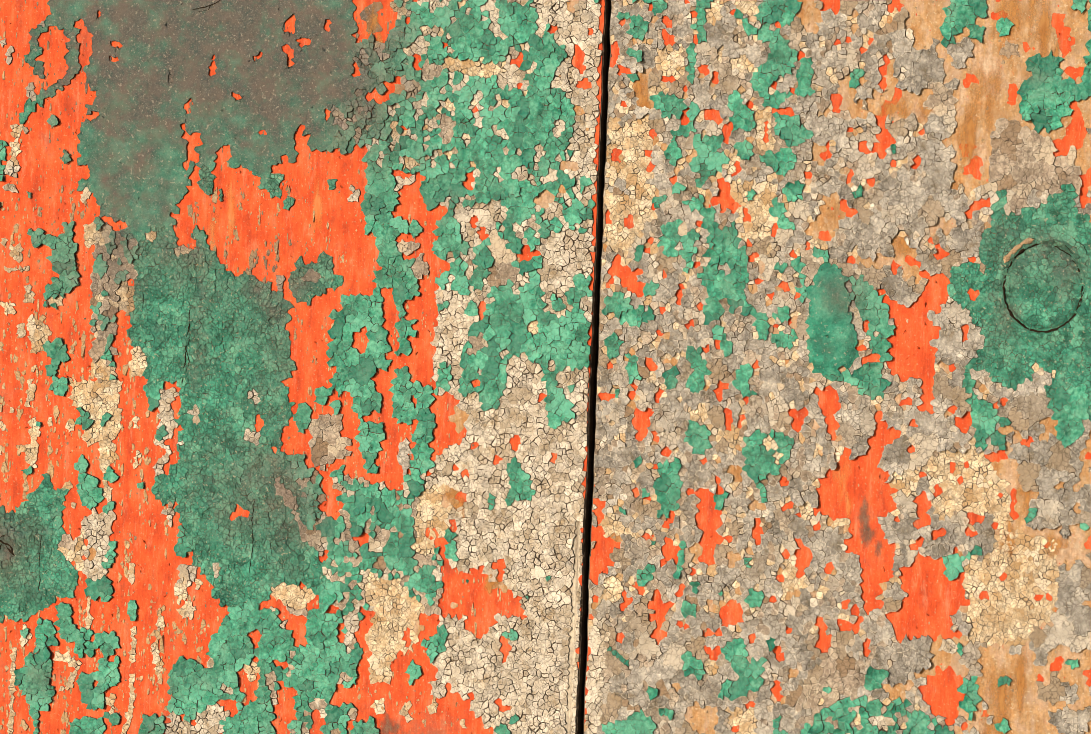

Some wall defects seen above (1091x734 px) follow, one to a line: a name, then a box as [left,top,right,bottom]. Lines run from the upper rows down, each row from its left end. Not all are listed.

peeling [0,0,605,734]
peeling [584,0,1091,734]